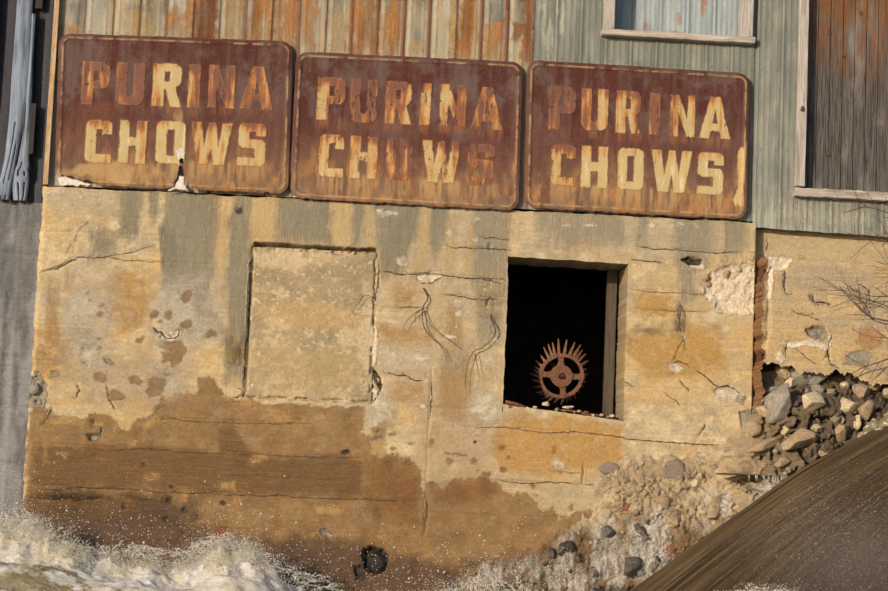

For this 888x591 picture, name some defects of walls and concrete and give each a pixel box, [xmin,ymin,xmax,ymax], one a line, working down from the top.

corrosion [166,0,317,52]
corrosion [351,0,399,55]
corrosion [448,0,534,65]
crack [41,223,160,272]
spalling [680,254,803,316]
spalling [775,326,833,364]
spalling [845,350,872,366]
damp [23,191,593,591]